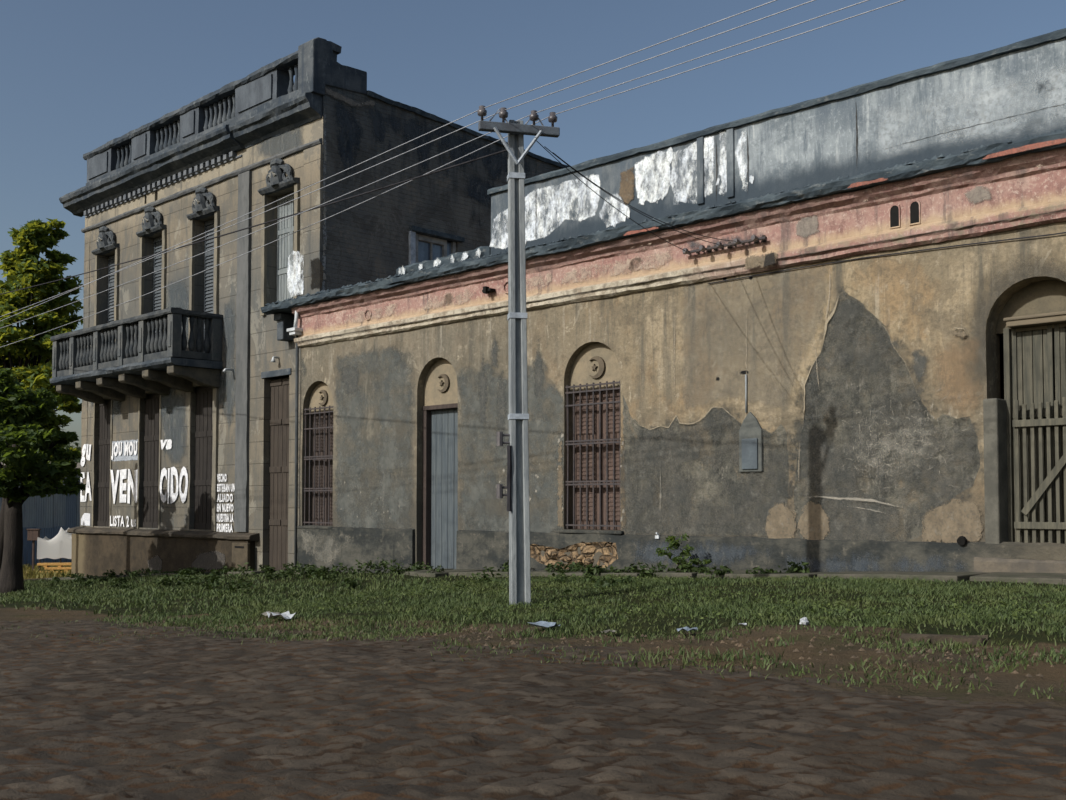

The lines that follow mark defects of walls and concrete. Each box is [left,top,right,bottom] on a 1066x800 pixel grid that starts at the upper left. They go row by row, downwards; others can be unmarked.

peeling [287,115,327,296]
leakage [335,104,508,225]
peeling [419,209,508,269]
peeling [525,131,754,244]
leakage [335,347,413,539]
leakage [457,341,509,532]
leakage [527,354,564,533]
flaking render [620,290,983,542]
leakage [301,531,337,564]